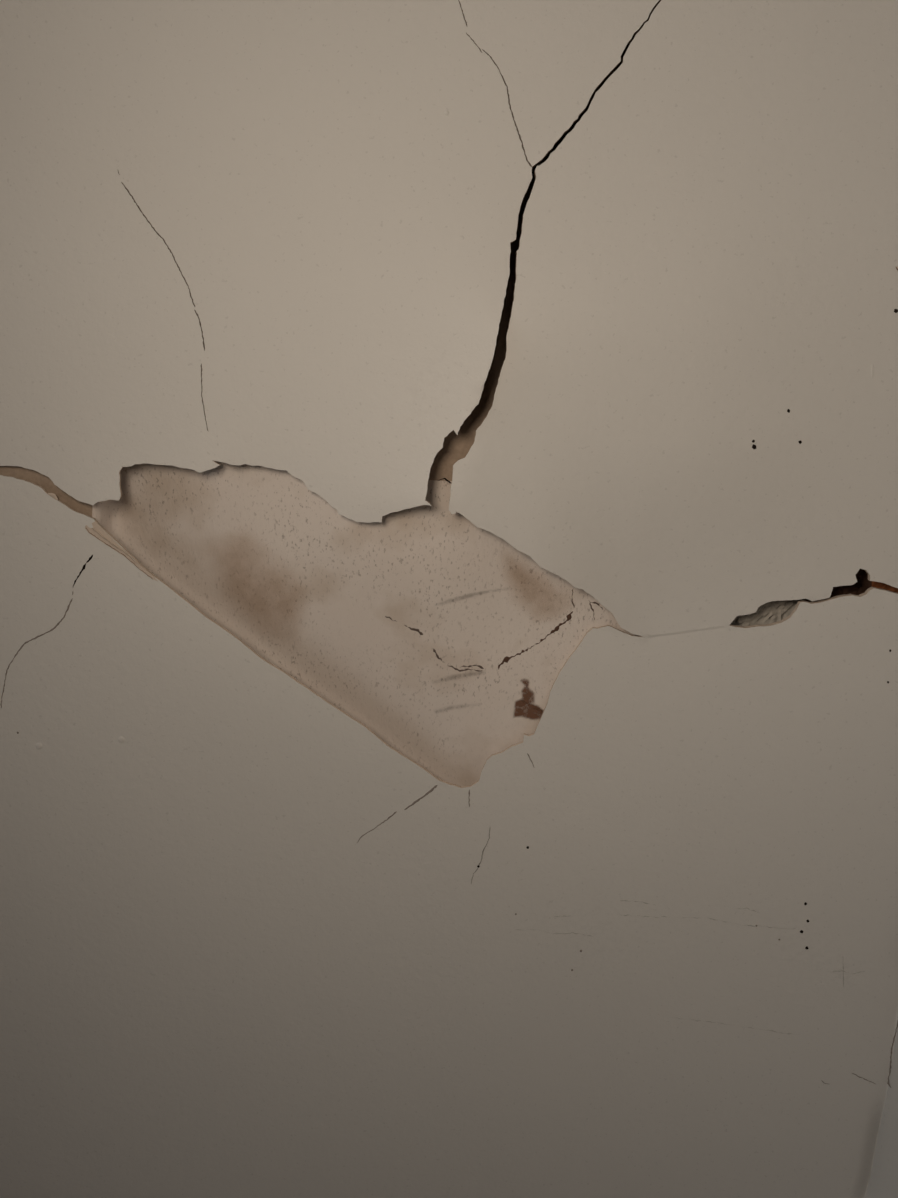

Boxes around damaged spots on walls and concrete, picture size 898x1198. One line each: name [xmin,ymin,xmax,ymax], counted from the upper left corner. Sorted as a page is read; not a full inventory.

crack [118,171,208,431]
crack [421,0,661,510]
crack [1,555,93,708]
crack [0,466,95,519]
peeling [61,460,645,788]
crack [729,569,898,628]